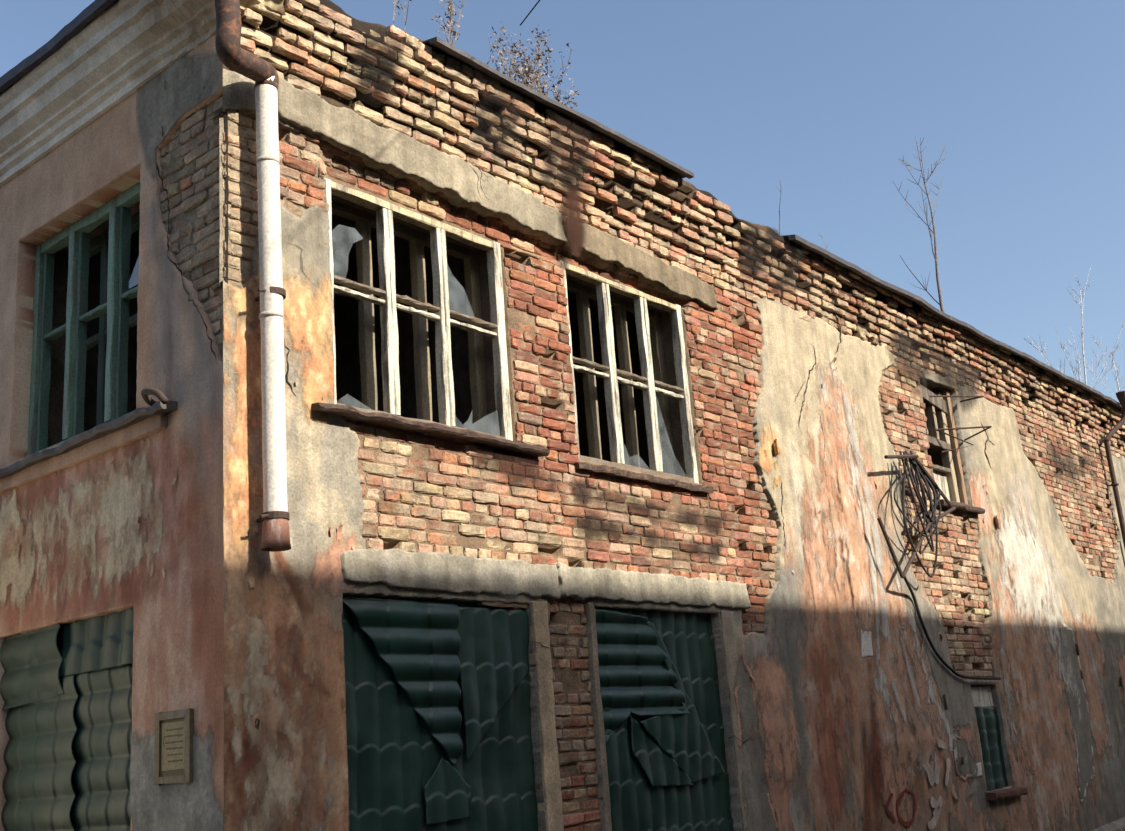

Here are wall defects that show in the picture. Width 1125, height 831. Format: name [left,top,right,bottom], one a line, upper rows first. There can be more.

water stain [547,135,589,184]
crack [155,162,219,365]
peeling [0,446,165,605]
flaking render [130,93,1125,831]
crack [794,313,842,483]